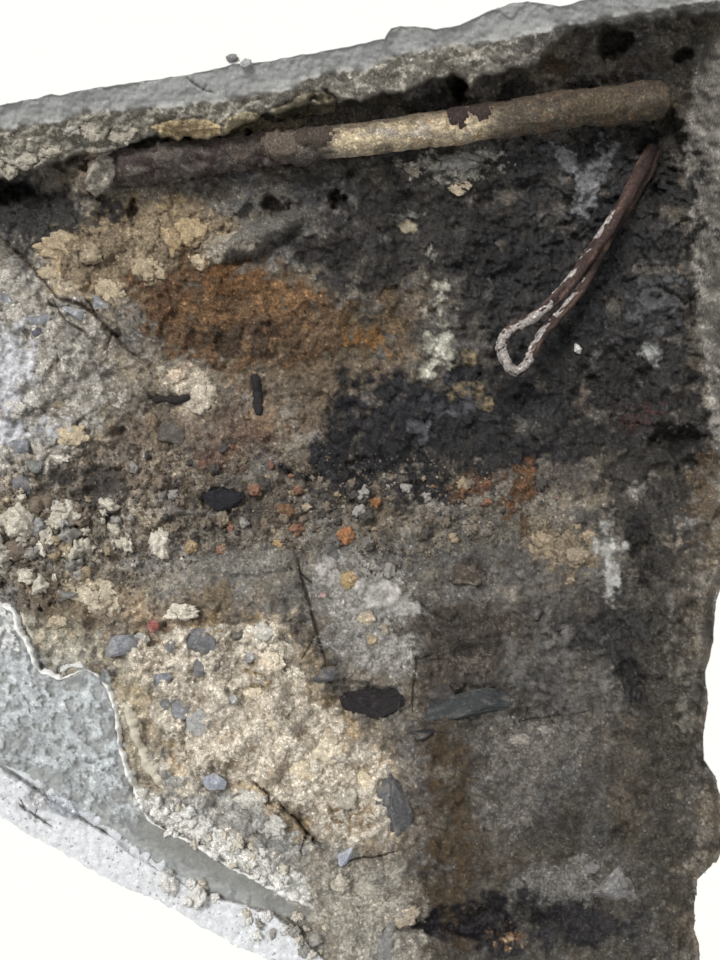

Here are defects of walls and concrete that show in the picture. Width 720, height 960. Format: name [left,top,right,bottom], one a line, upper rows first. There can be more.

spalling [0,91,338,197]
spalling [392,144,516,196]
spalling [0,199,237,495]
corrosion [121,246,409,376]
peeling [495,210,615,377]
spalling [57,570,125,618]
spalling [309,539,424,691]
damp [277,121,720,891]
spalling [516,517,601,585]
spalling [0,601,431,960]
spalling [468,701,611,847]
spalling [500,852,636,912]